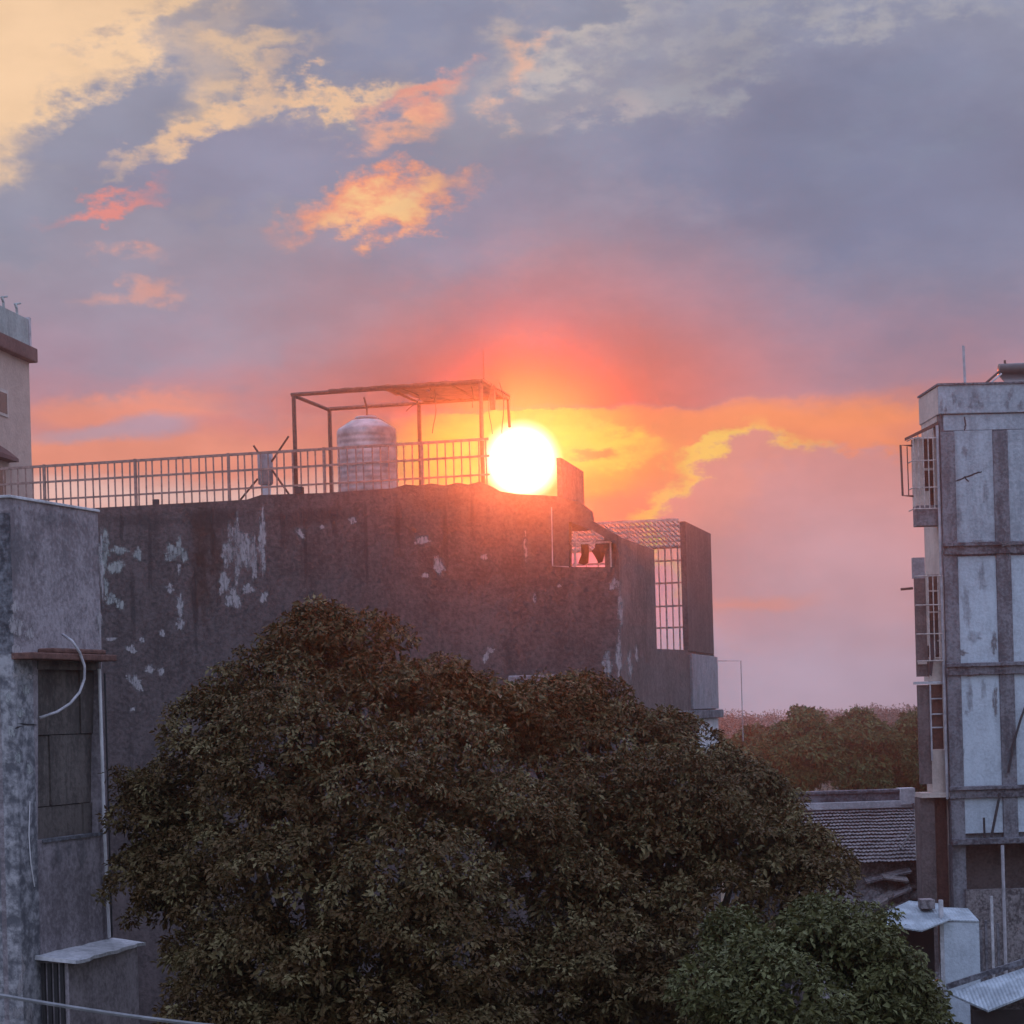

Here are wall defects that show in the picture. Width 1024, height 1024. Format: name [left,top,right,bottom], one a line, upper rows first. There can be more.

peeling [99,530,141,610]
peeling [160,536,188,637]
peeling [219,507,268,608]
peeling [126,665,164,691]